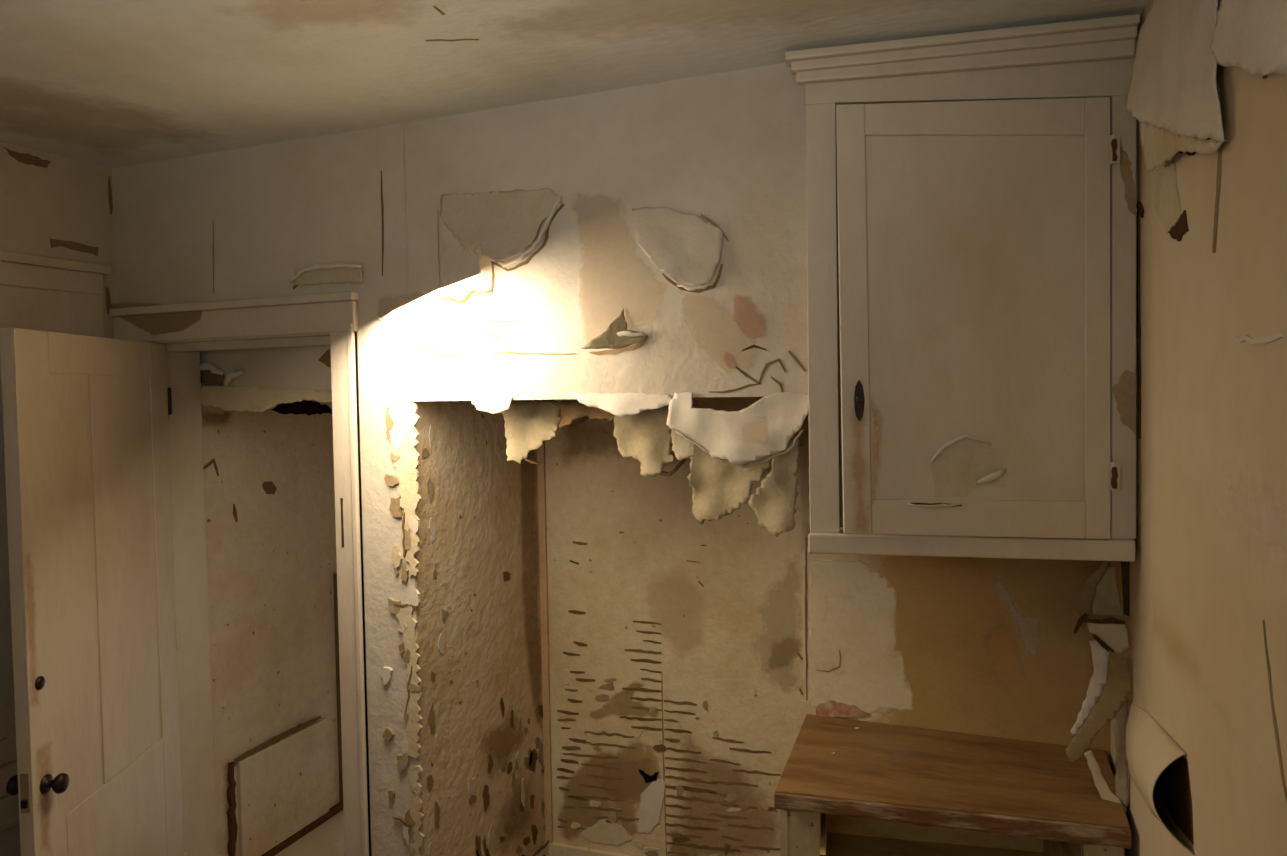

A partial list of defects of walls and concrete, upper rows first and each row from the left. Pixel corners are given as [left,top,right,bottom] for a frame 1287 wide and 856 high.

peeling [578,198,729,343]
flaking render [733,296,765,339]
peeling [1155,162,1182,232]
flaking render [380,401,440,856]
flaking render [754,561,913,729]
peeling [468,698,545,856]